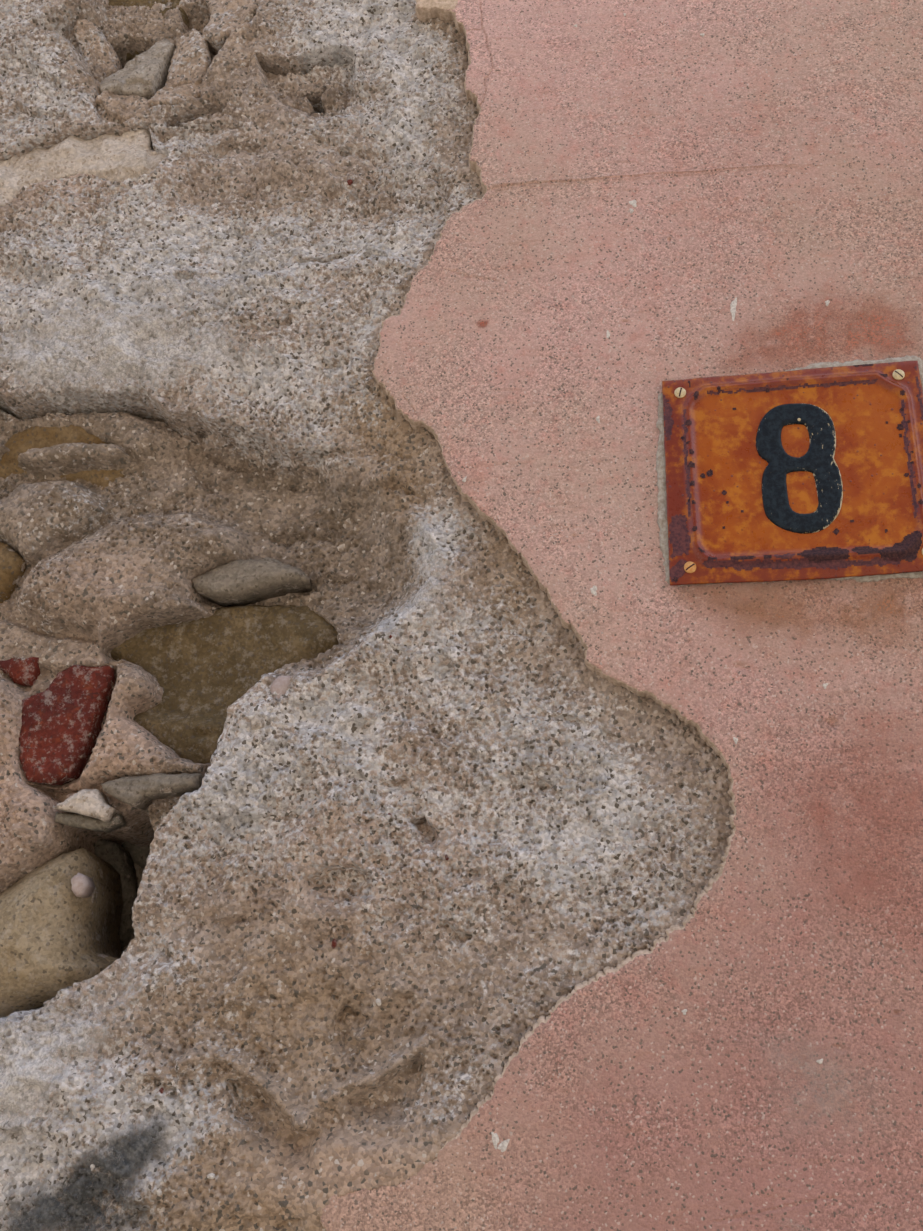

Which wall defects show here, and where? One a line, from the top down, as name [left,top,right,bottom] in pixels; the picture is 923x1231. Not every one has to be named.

crack [466,0,505,106]
crack [485,161,853,195]
rust [663,364,923,583]
spalling [0,0,737,1231]